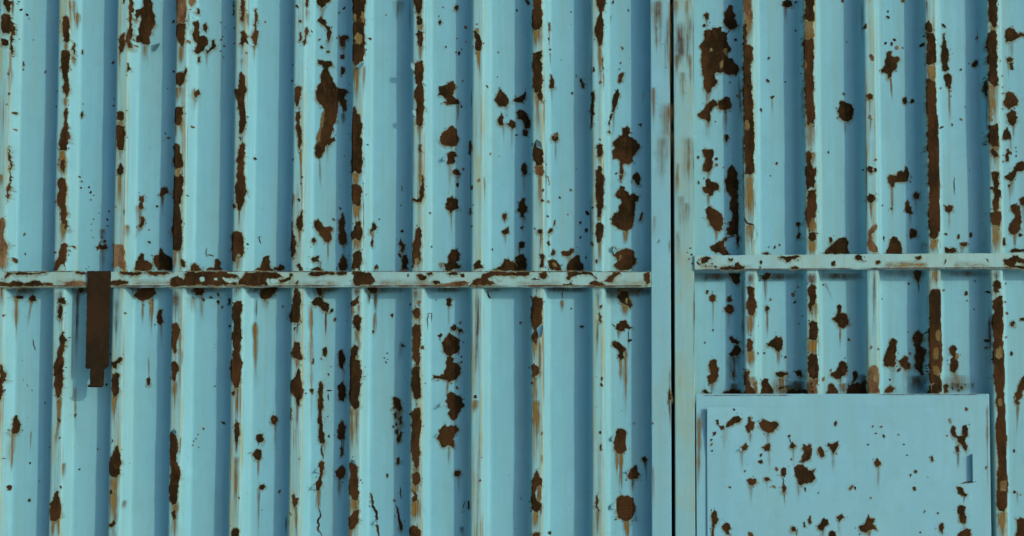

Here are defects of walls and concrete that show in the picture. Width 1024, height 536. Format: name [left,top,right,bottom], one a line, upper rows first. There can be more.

corrosion [0,0,86,448]
corrosion [91,0,650,536]
corrosion [656,0,1024,536]